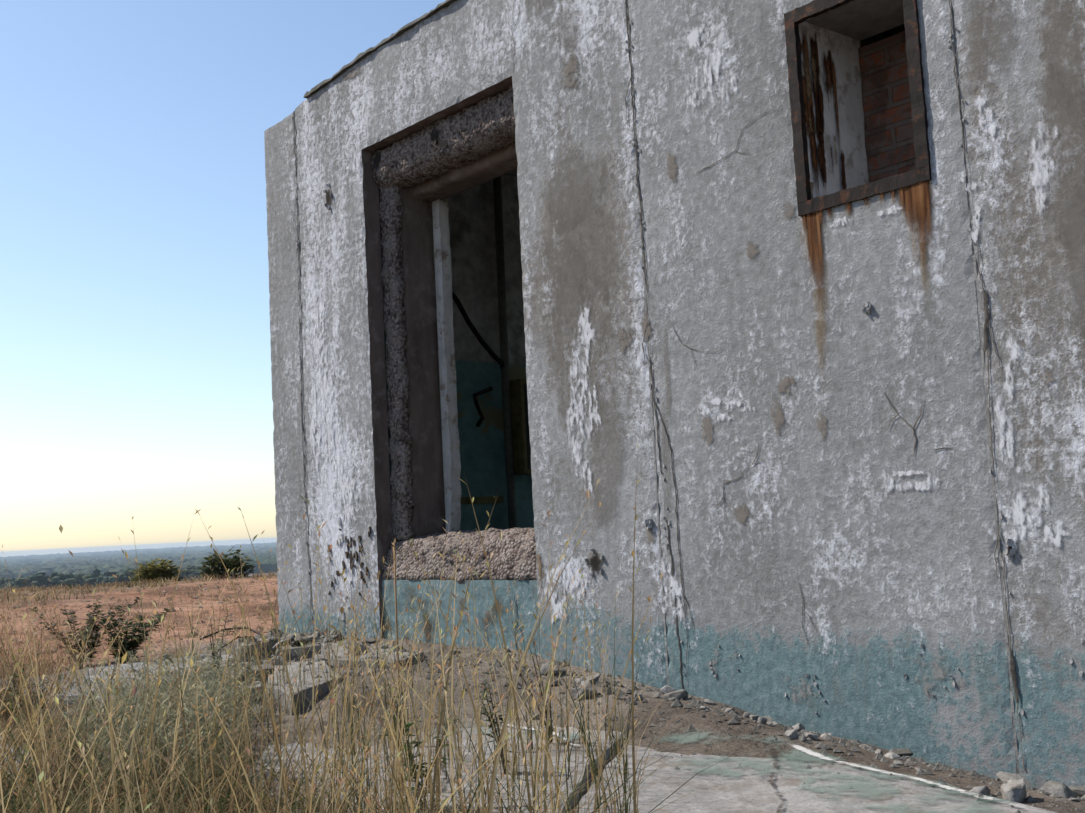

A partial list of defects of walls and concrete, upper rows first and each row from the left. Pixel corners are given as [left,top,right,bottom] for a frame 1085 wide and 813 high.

rust [800,31,847,199]
rust [802,208,831,276]
rust [880,180,931,243]